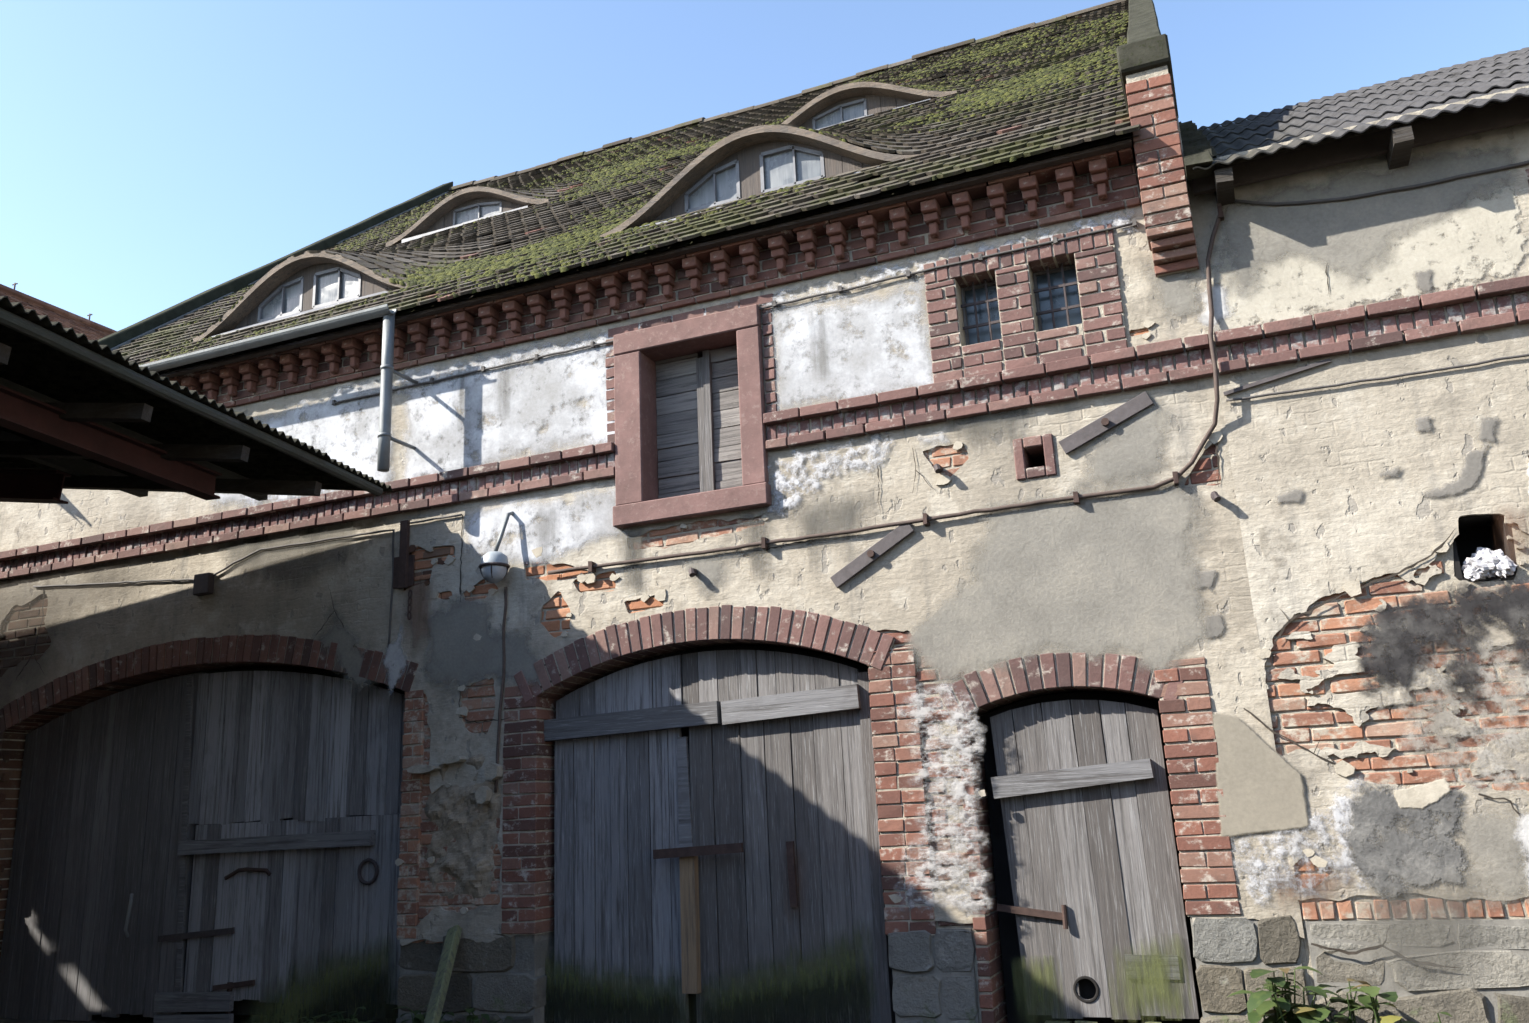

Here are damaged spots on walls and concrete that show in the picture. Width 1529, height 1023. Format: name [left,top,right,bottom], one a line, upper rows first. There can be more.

flaking render [918,433,968,486]
flaking render [1184,431,1223,486]
peeling [404,433,892,637]
flaking render [0,594,51,677]
flaking render [456,678,496,734]
flaking render [1234,515,1529,921]
leakage [1441,633,1482,703]
leakage [1513,633,1529,670]
flaking render [395,694,502,944]
peeling [877,630,989,926]